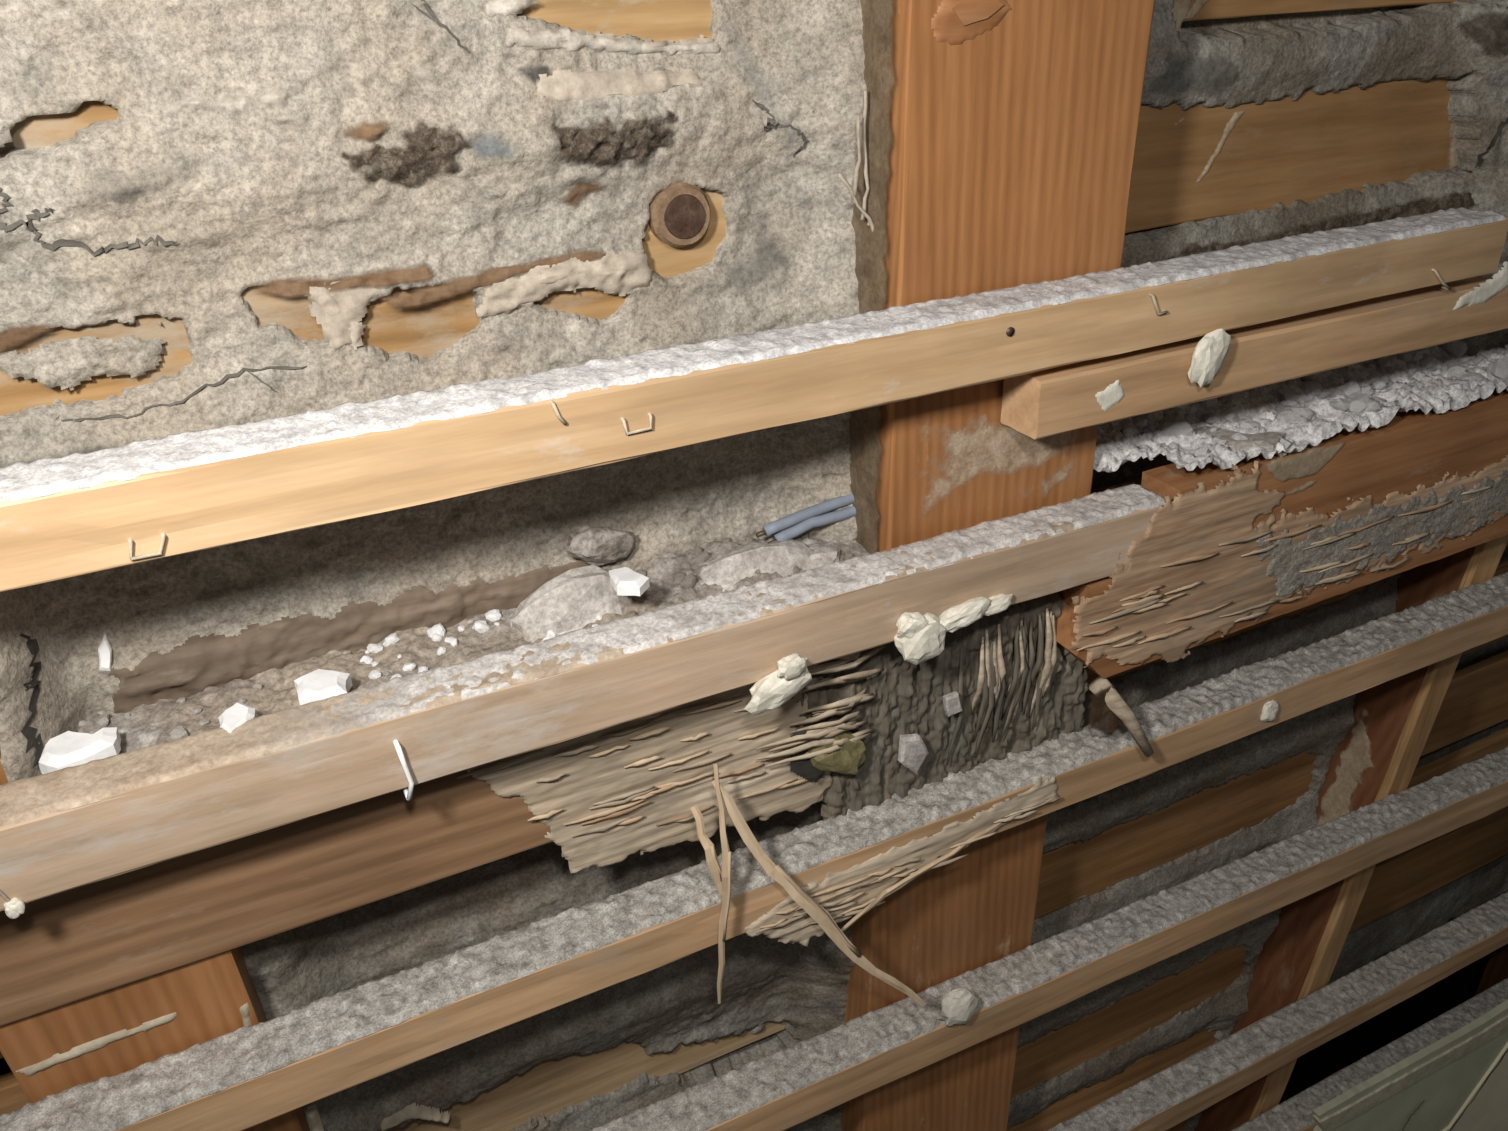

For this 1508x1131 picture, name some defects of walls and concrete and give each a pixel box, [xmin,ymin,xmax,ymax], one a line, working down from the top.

flaking render [500,0,713,48]
flaking render [0,101,118,153]
flaking render [534,67,702,166]
crack [1474,117,1508,168]
crack [0,188,178,256]
flaking render [241,284,479,357]
flaking render [0,314,192,416]
flaking render [609,567,650,596]
flaking render [98,558,590,714]